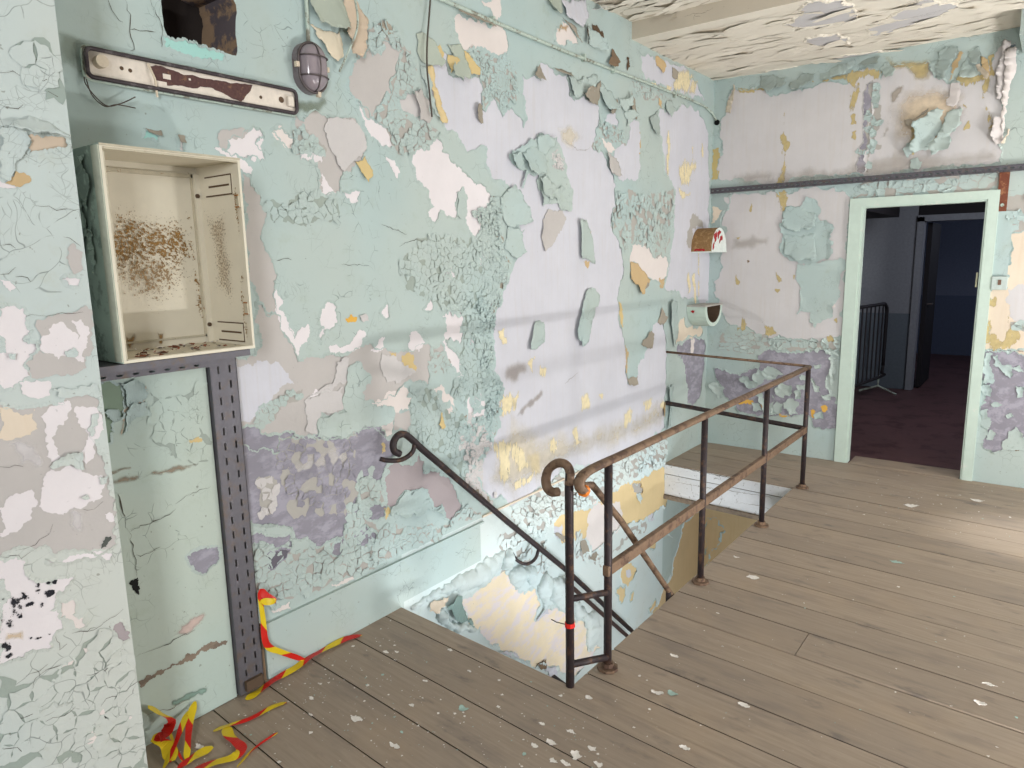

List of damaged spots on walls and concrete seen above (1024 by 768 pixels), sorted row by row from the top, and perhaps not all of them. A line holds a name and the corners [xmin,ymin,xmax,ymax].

peeling [161,35,226,63]
peeling [0,116,72,189]
peeling [214,0,1024,571]
peeling [0,279,152,567]
crack [84,380,213,572]
crack [0,613,148,768]
peeling [109,618,132,666]
spalling [129,578,140,595]
spalling [462,569,601,677]
peeling [615,561,637,604]
peeling [648,512,725,616]